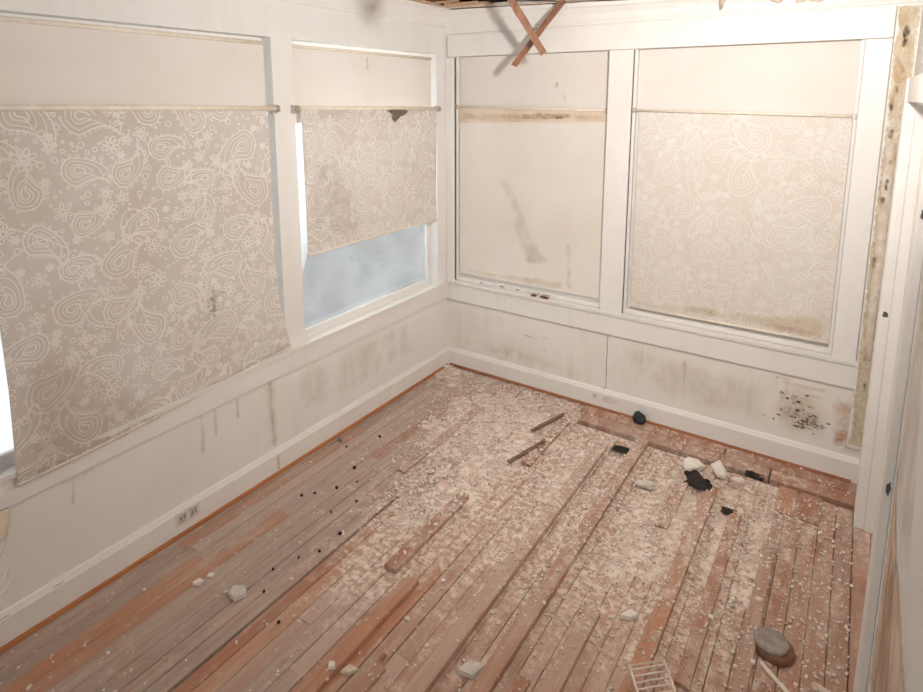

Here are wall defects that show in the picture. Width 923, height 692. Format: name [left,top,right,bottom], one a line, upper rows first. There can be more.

spalling [407,0,564,9]
peeling [849,6,919,447]